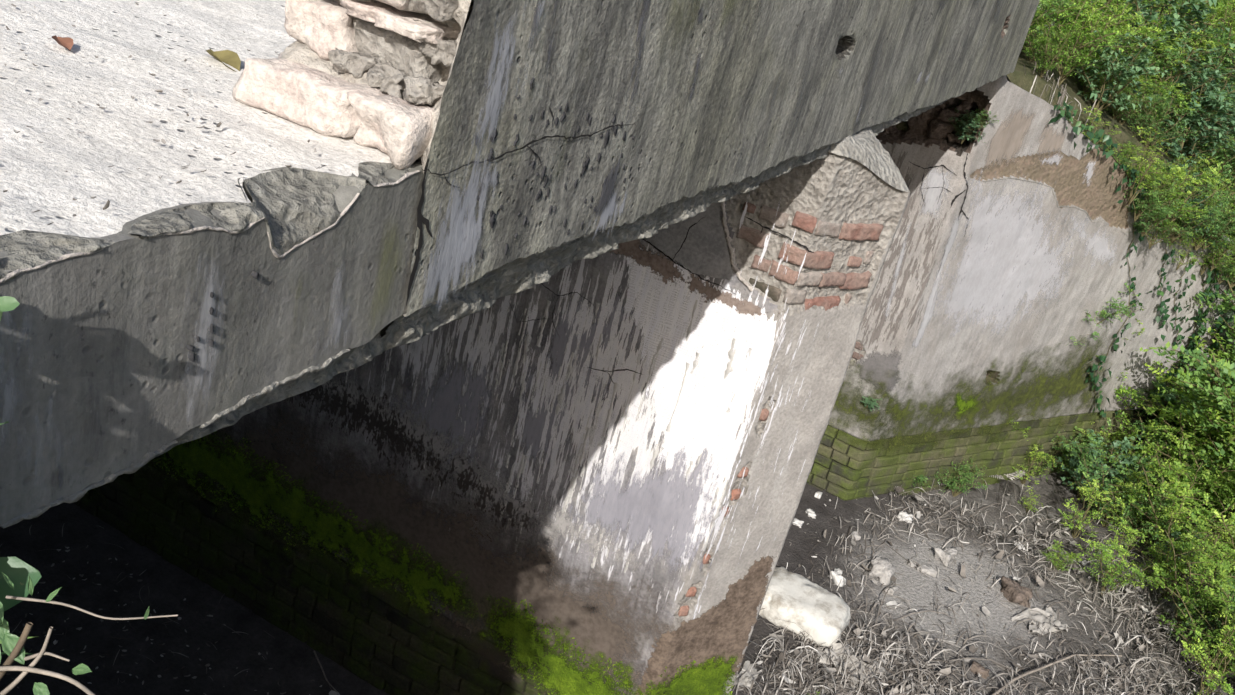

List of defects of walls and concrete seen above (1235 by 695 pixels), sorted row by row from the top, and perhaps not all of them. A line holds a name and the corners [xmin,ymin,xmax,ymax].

water stain [187,276,215,387]
peeling [0,75,1004,623]
crack [406,107,636,306]
water stain [515,293,634,465]
crack [643,217,735,294]
peeling [970,147,1132,230]
water stain [205,359,773,695]